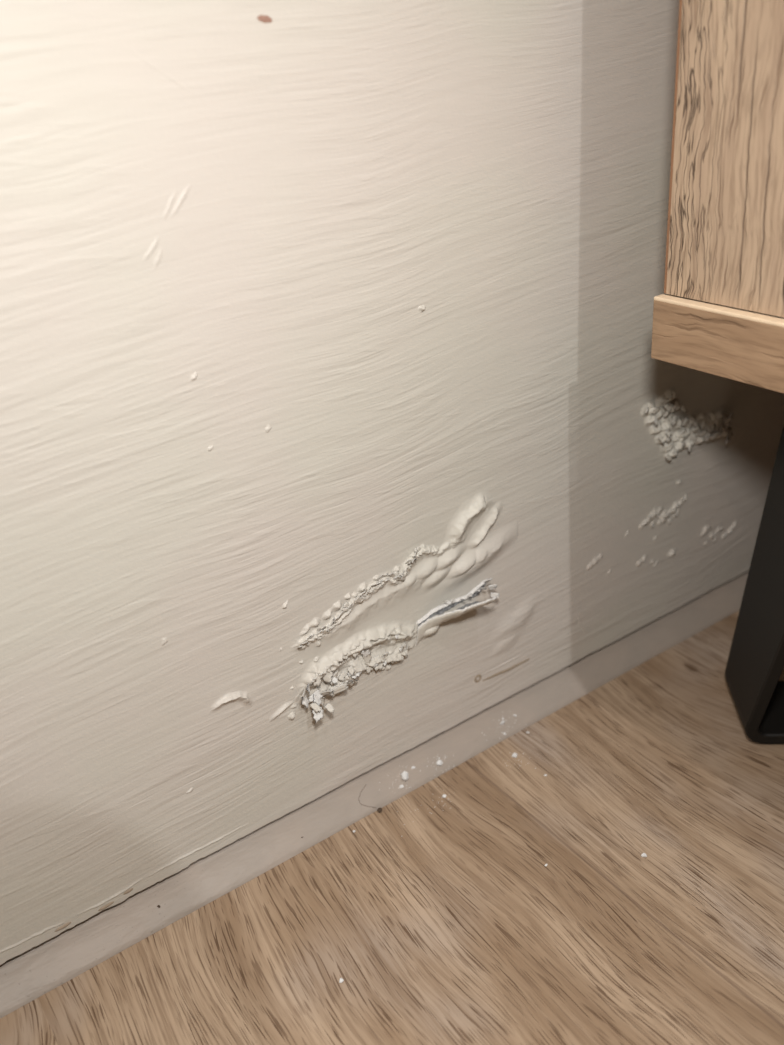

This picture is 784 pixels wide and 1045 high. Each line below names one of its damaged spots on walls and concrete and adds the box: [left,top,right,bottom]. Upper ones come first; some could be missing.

peeling [640,387,734,462]
peeling [269,491,519,723]